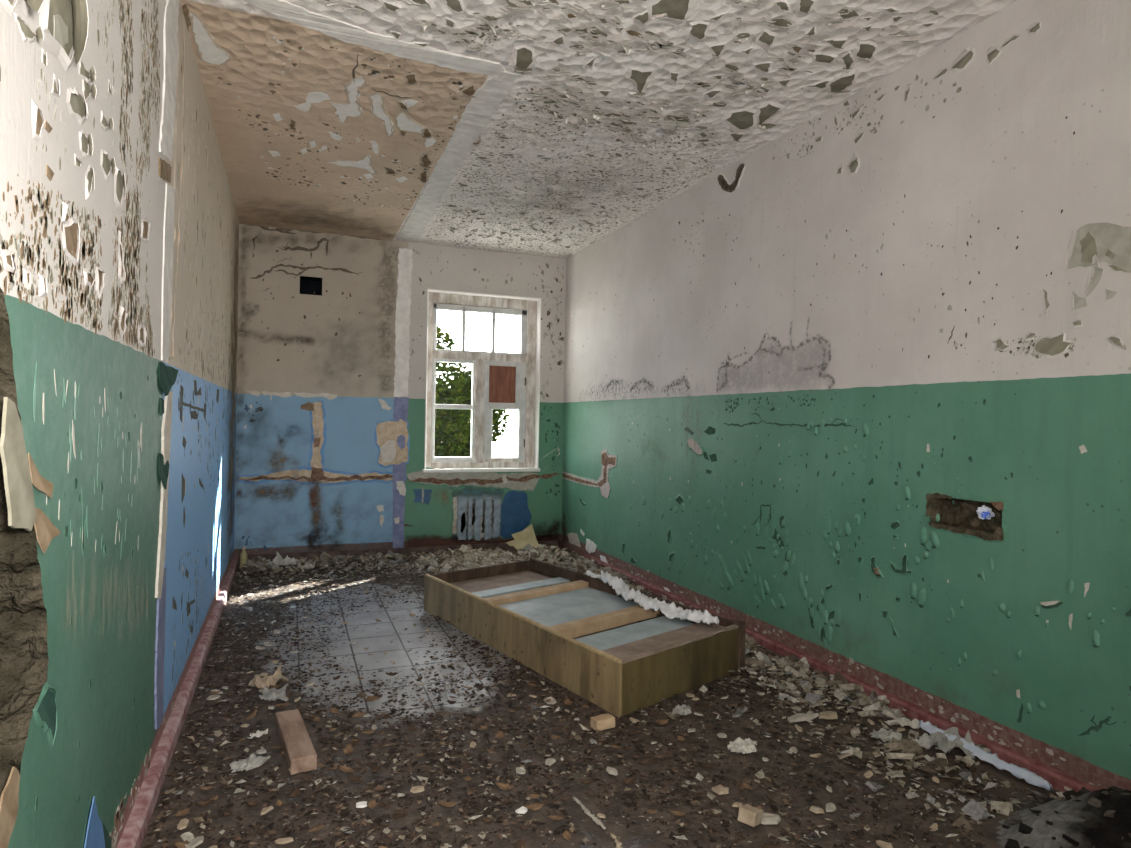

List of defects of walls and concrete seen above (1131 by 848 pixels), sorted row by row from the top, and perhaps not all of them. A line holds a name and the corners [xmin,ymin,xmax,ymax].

peeling [182,4,477,215]
crack [246,224,383,292]
peeling [237,0,1041,540]
peeling [978,223,1131,359]
leakage [717,321,835,389]
spalling [0,0,236,848]
crack [724,413,852,427]
spalling [836,478,1008,603]
spalling [1040,601,1073,629]